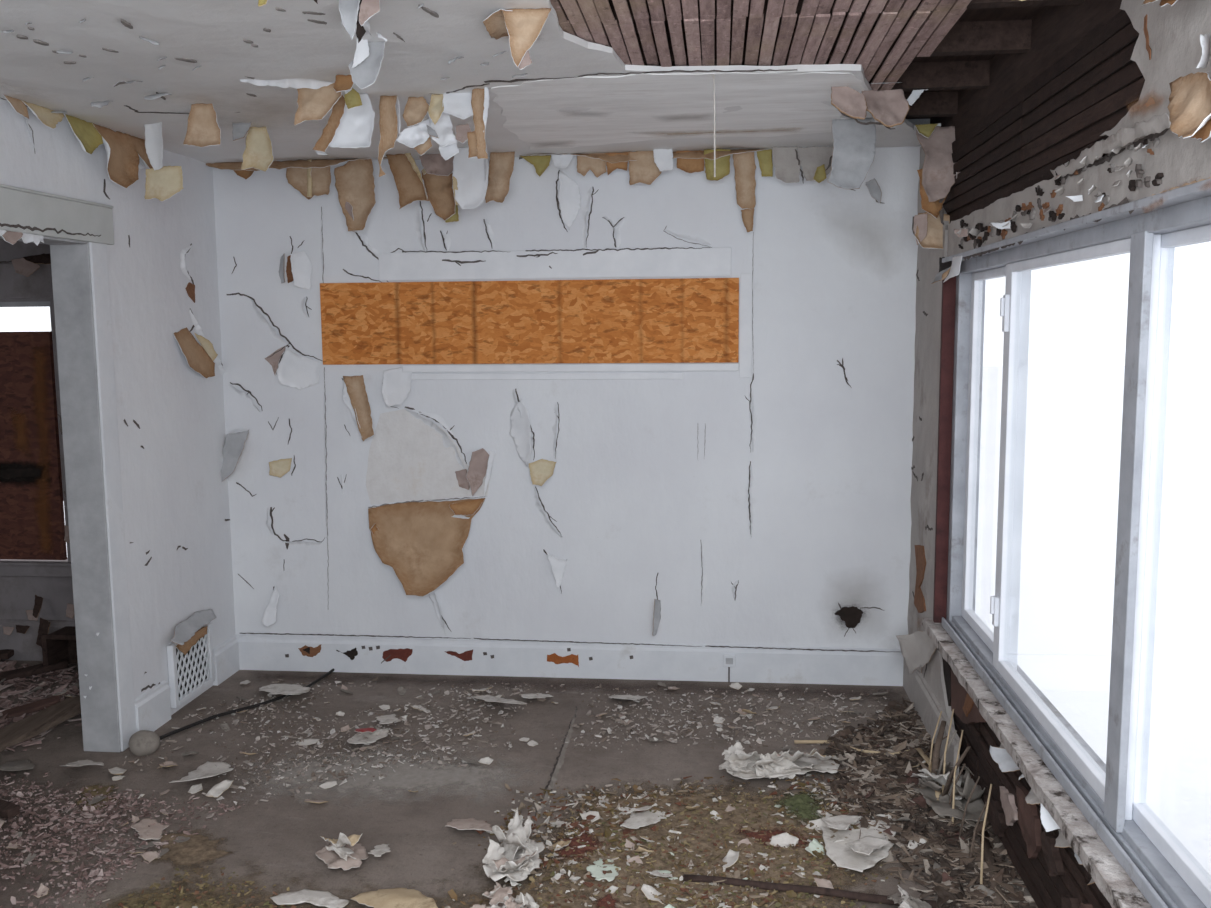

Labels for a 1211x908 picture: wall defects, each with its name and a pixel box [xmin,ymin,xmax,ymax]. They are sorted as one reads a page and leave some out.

peeling [2,22,87,64]
peeling [4,95,184,202]
flaking render [183,0,1211,290]
crack [180,243,195,303]
peeling [173,309,225,378]
crack [227,186,712,603]
crack [745,232,757,538]
peeling [285,644,322,657]
peeling [336,646,413,663]
peeling [444,650,494,661]
peeling [547,648,593,667]
peeling [983,744,1083,876]